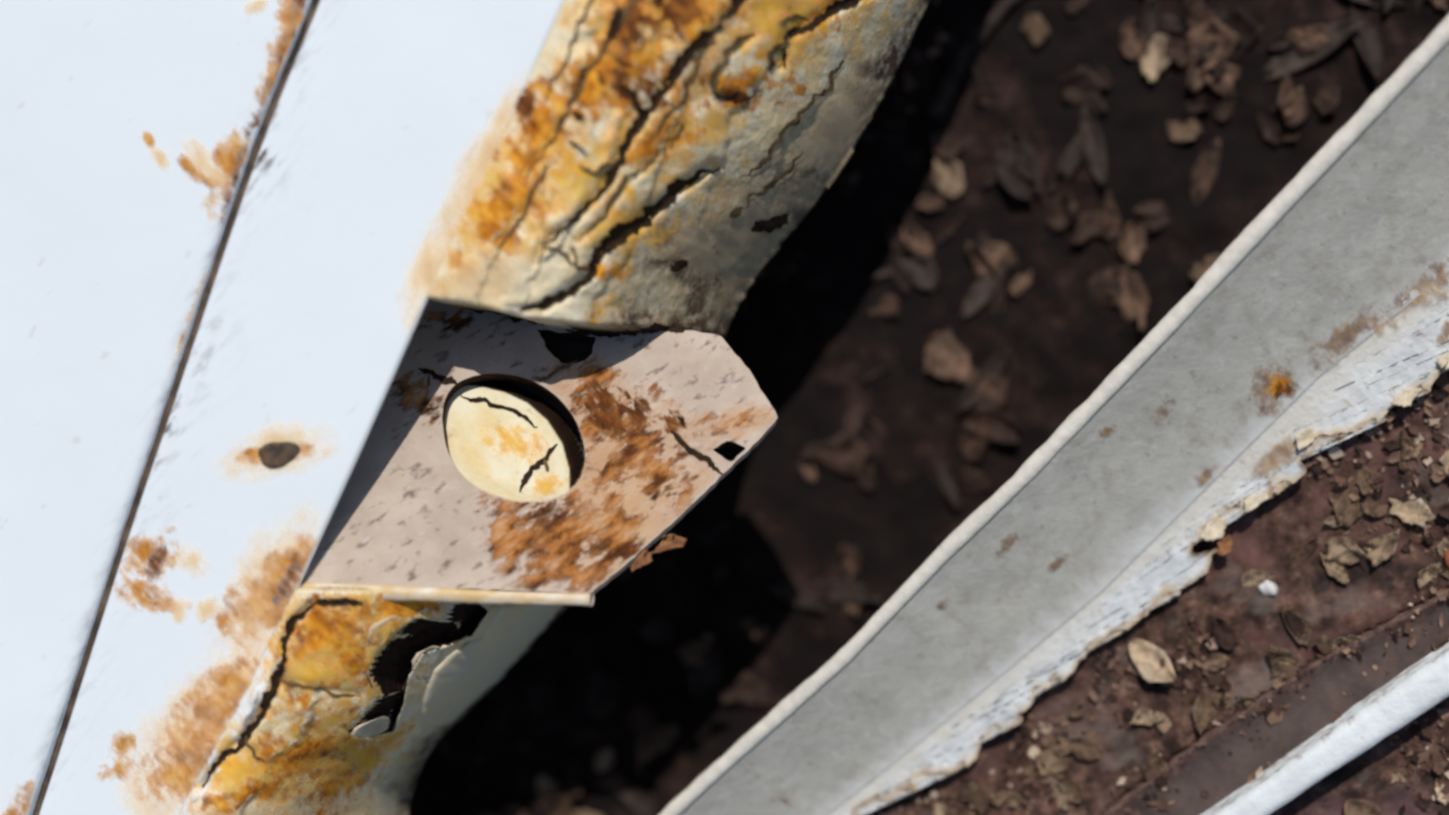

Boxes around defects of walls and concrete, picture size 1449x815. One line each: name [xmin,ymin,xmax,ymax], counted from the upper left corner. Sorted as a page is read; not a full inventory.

corrosion [143,0,306,222]
corrosion [414,0,891,290]
crack [469,0,859,382]
crack [418,368,557,492]
corrosion [478,359,770,591]
crack [670,415,723,475]
peeling [1199,514,1232,556]
peeling [1244,493,1269,513]
peeling [1389,388,1424,407]
peeling [1437,352,1449,371]
corrosion [98,535,440,815]
crack [201,597,364,787]